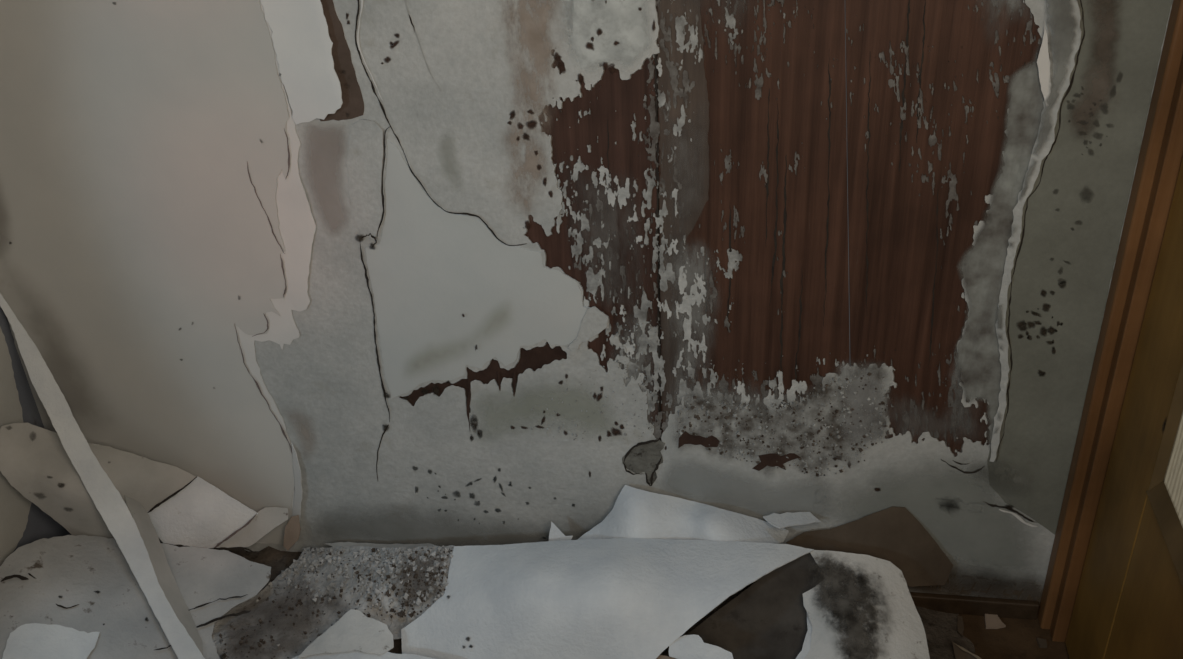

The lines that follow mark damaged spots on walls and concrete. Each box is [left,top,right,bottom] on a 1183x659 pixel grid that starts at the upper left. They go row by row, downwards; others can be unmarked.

peeling [347,119,383,239]
crack [355,0,527,480]
flaking render [400,0,1085,486]
damp [1017,258,1069,354]